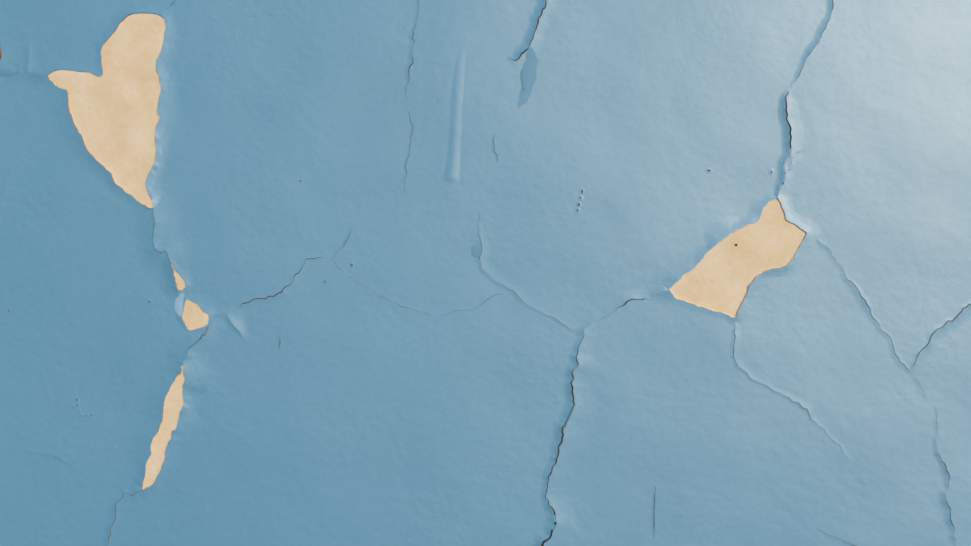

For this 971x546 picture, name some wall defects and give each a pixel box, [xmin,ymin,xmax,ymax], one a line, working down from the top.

peeling [38,2,181,218]
crack [403,0,419,190]
crack [507,0,558,111]
crack [773,0,833,212]
crack [131,188,191,285]
peeling [120,249,223,499]
crack [165,227,352,383]
crack [471,221,682,546]
peeling [644,185,824,328]
crack [730,314,854,464]
crack [803,230,971,546]
crack [100,477,145,546]